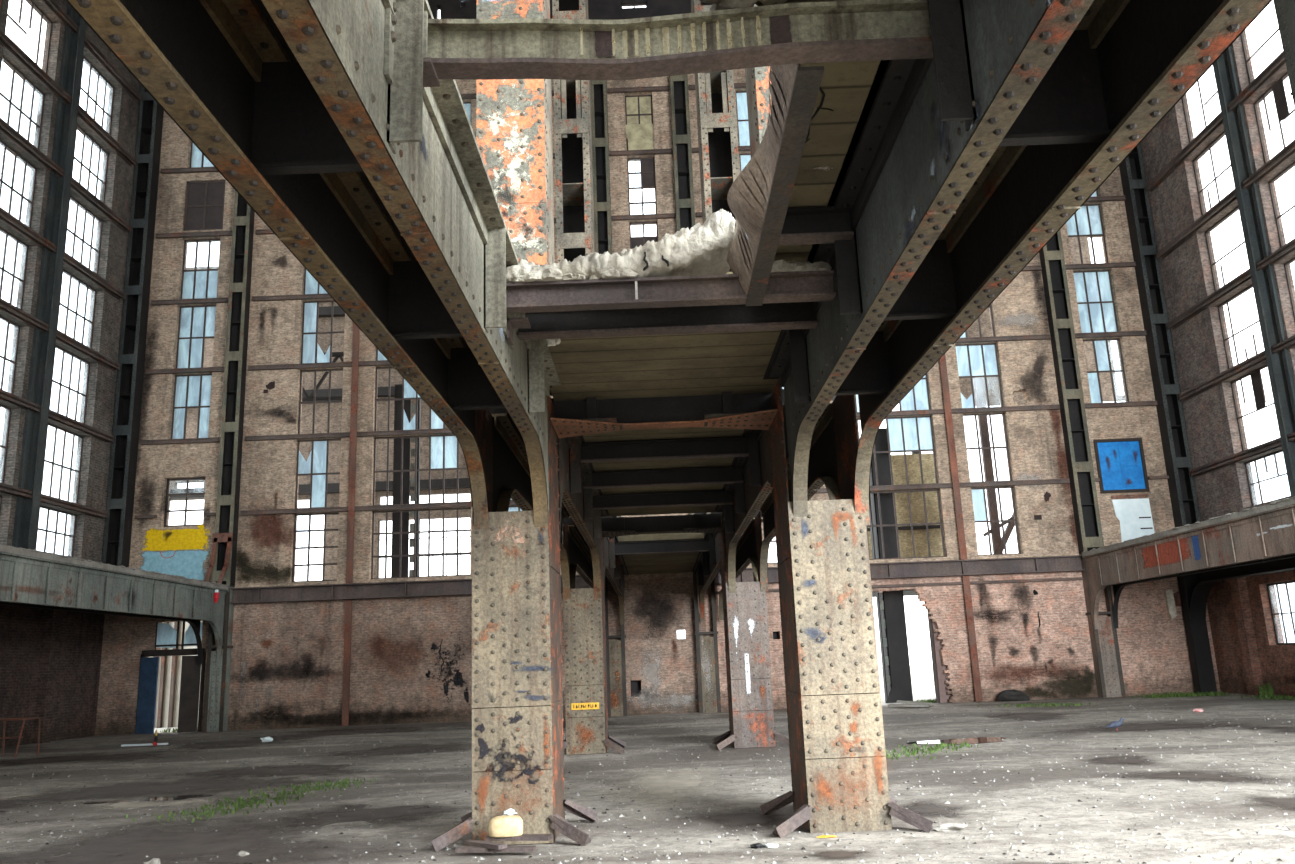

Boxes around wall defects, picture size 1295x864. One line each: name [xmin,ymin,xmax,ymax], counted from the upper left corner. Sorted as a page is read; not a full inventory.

spalling [699,0,787,11]
leakage [978,584,991,616]
leakage [1015,586,1040,661]
peeling [475,715,550,784]